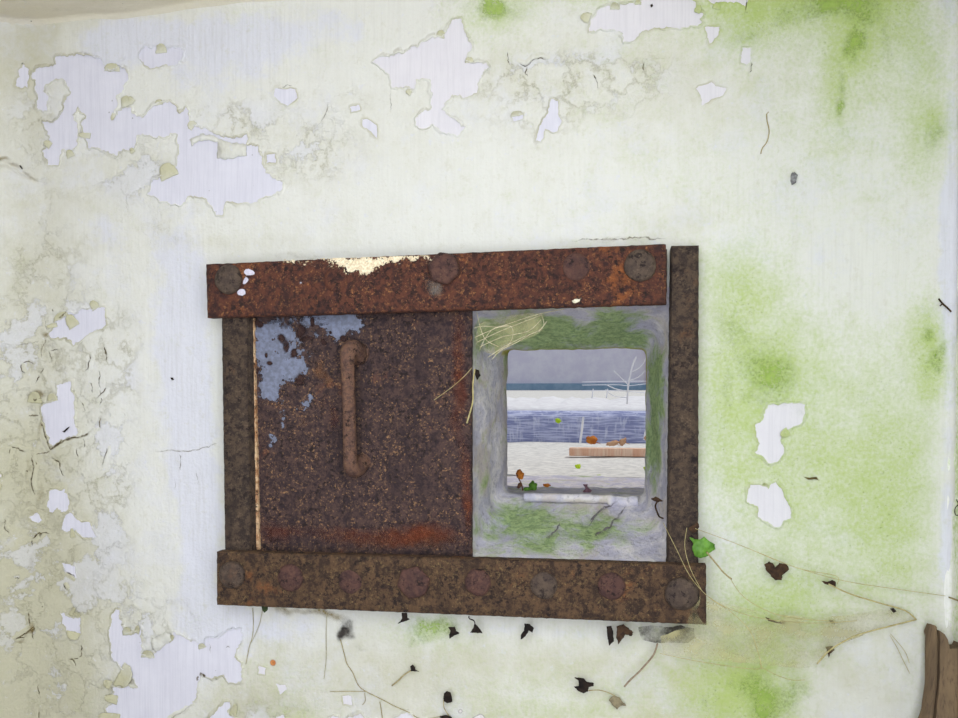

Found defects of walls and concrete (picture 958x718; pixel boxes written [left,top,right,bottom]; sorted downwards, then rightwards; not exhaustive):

peeling [580,0,751,47]
peeling [371,16,491,138]
peeling [13,51,285,218]
peeling [46,300,109,347]
rust [277,317,346,357]
peeling [27,377,82,447]
peeling [750,399,809,466]
peeling [27,487,100,541]
peeling [744,479,795,530]
peeling [59,607,84,640]
peeling [98,607,245,718]